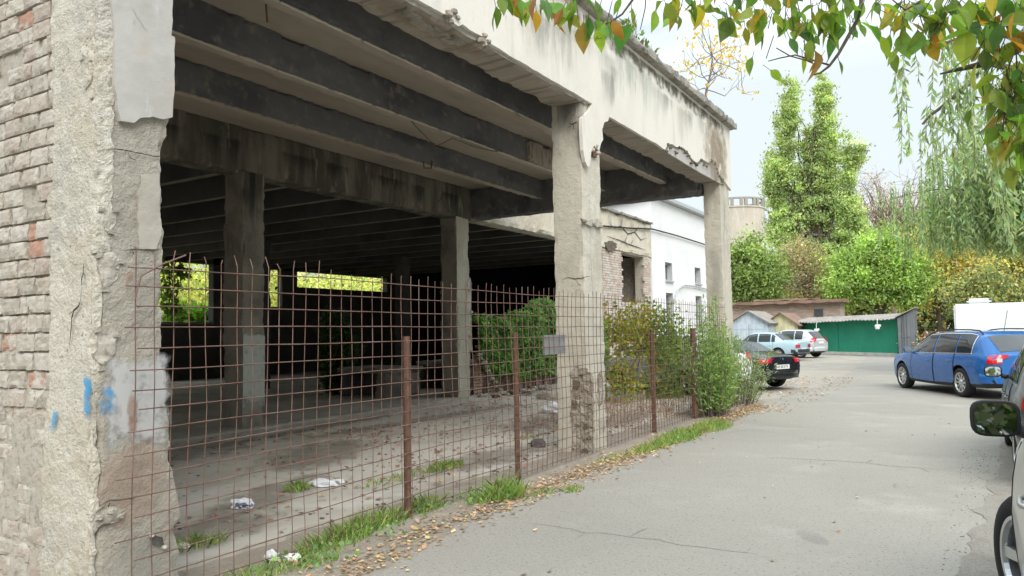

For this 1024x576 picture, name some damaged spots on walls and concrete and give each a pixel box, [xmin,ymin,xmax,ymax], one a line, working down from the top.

peeling [664,143,725,186]
spalling [604,241,617,251]
crack [589,203,646,250]
crack [69,264,85,344]
spalling [570,366,606,454]